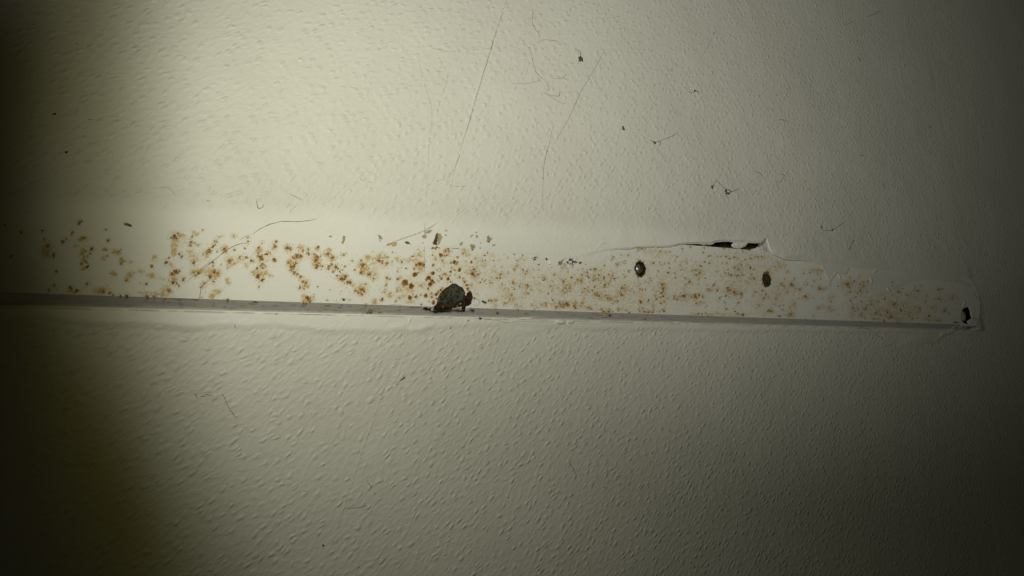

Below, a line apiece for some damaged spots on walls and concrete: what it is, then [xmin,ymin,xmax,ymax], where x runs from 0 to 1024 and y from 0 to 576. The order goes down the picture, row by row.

rust [41,220,959,323]